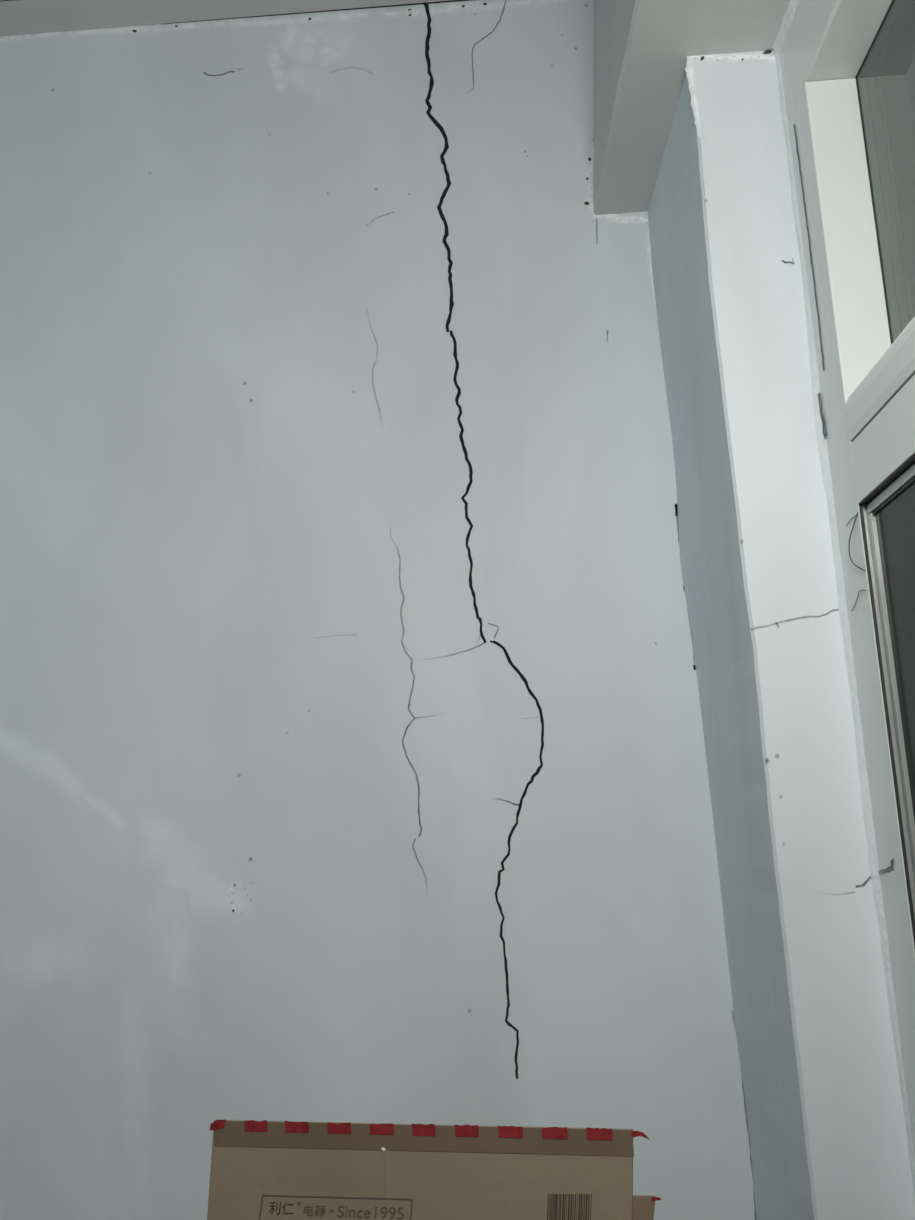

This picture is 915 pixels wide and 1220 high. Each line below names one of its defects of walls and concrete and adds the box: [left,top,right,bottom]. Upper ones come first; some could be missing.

crack [402,688,422,844]
crack [423,4,544,1079]